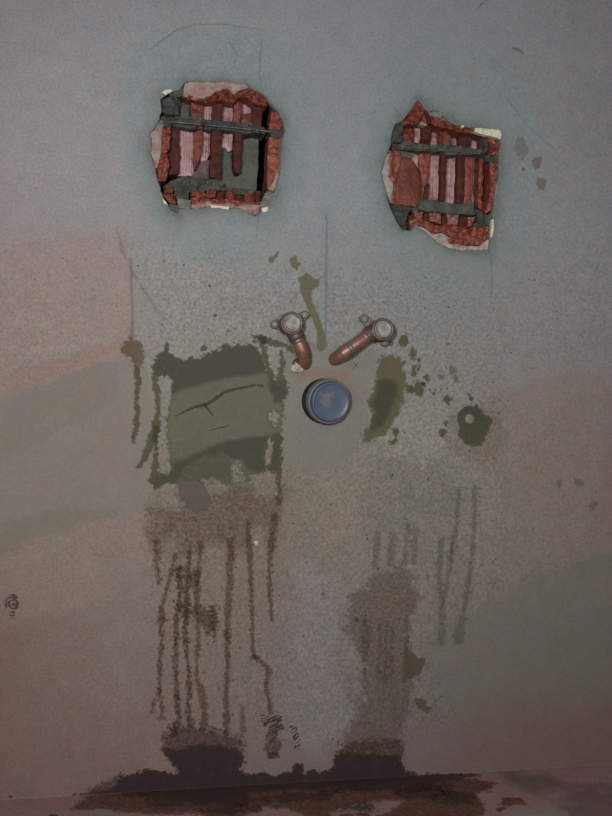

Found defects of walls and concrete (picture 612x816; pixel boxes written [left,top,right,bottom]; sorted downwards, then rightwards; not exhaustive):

spalling [150,81,286,217]
spalling [381,100,502,251]
leakage [290,256,326,351]
leakage [131,334,294,513]
crack [176,384,264,431]
leakage [362,333,458,445]
leakage [439,394,493,447]
leakage [72,724,480,806]